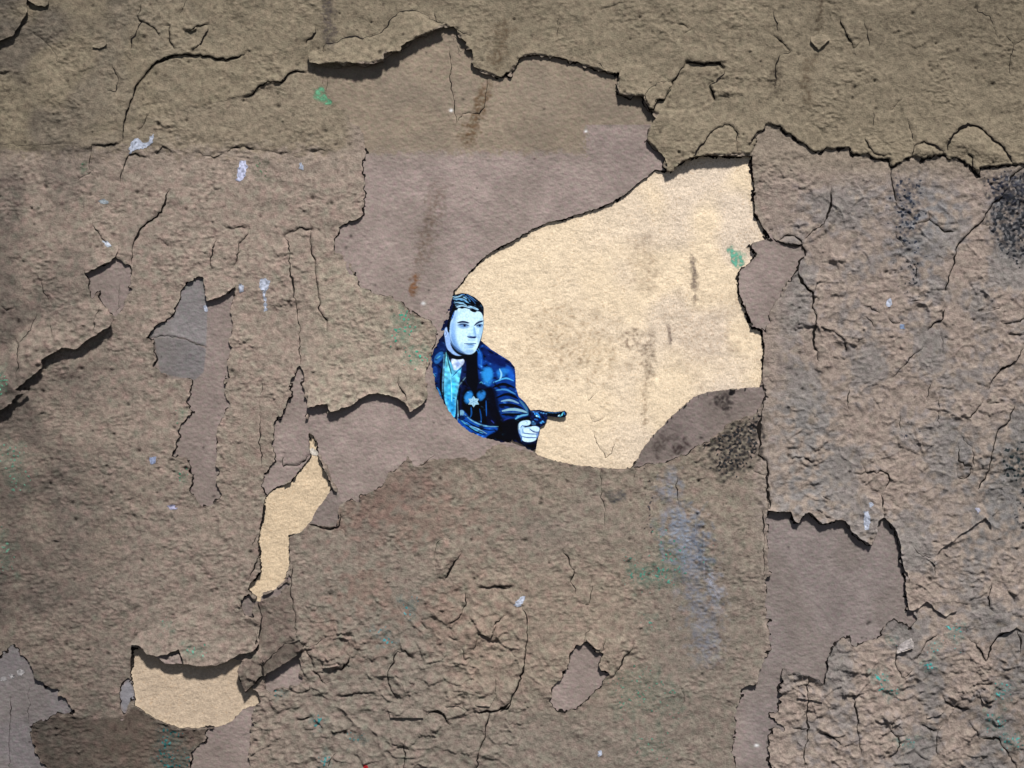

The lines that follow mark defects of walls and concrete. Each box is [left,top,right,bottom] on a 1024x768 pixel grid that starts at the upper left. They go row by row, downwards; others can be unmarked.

crack [3,0,245,181]
crack [131,191,169,264]
crack [284,227,328,357]
crack [694,101,1024,377]
peeling [119,12,805,768]
crack [753,382,830,573]
crack [927,308,1024,489]
peeling [0,644,75,768]
crack [238,565,363,720]
crack [424,538,528,768]
peeling [731,490,996,768]
crack [889,629,1024,767]